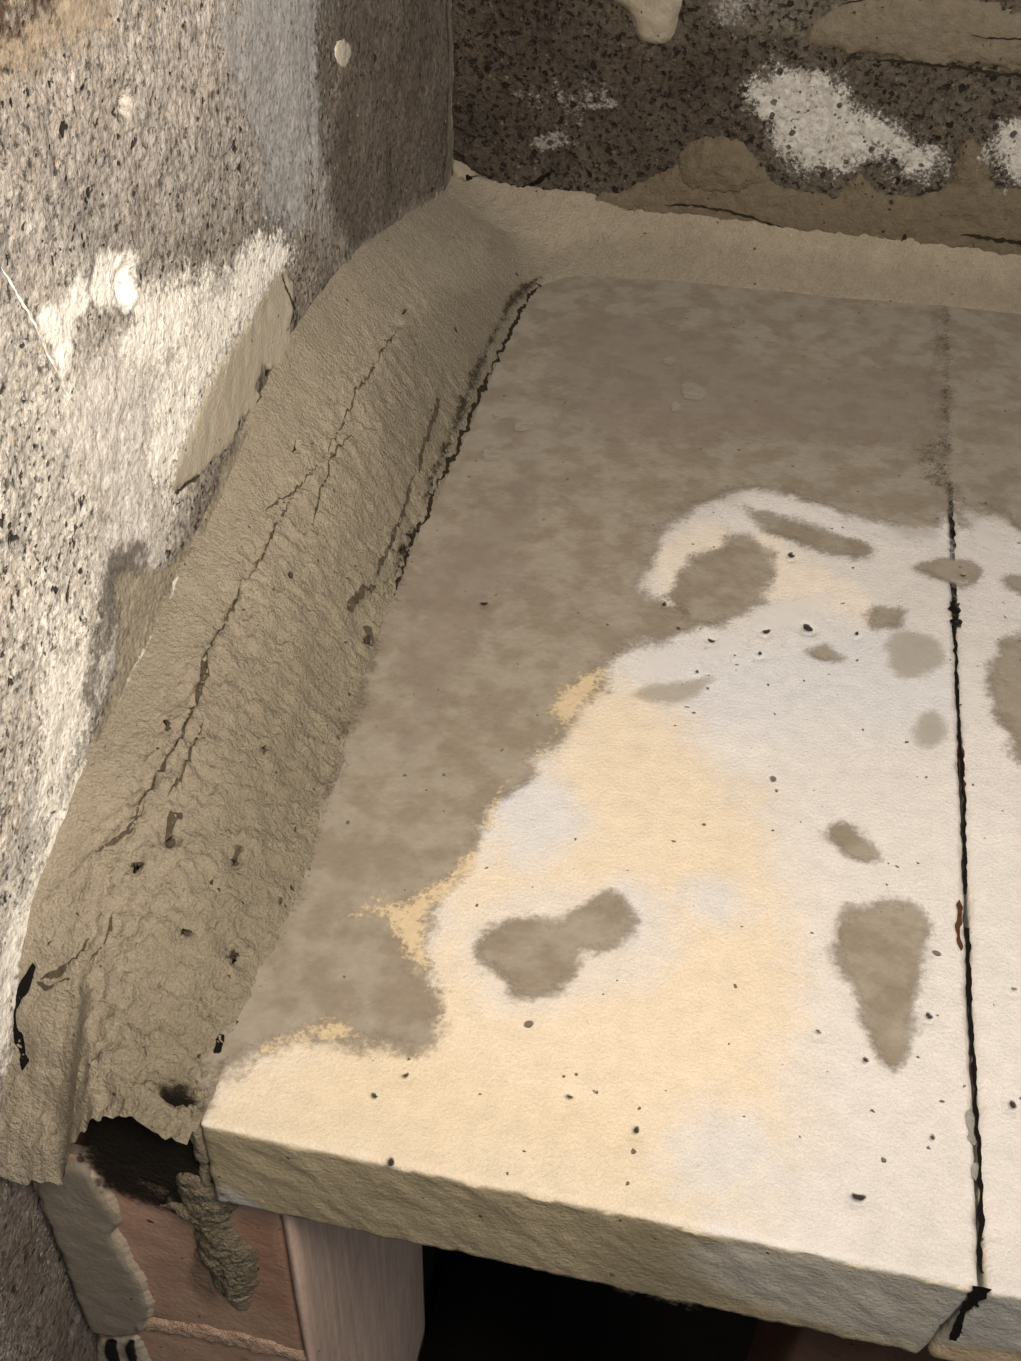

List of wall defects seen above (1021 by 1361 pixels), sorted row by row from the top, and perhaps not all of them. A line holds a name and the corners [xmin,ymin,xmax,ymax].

crack [869,35,1021,78]
crack [98,327,399,851]
crack [385,276,542,596]
water stain [190,276,1021,1116]
crack [948,484,968,894]
crack [949,927,992,1341]